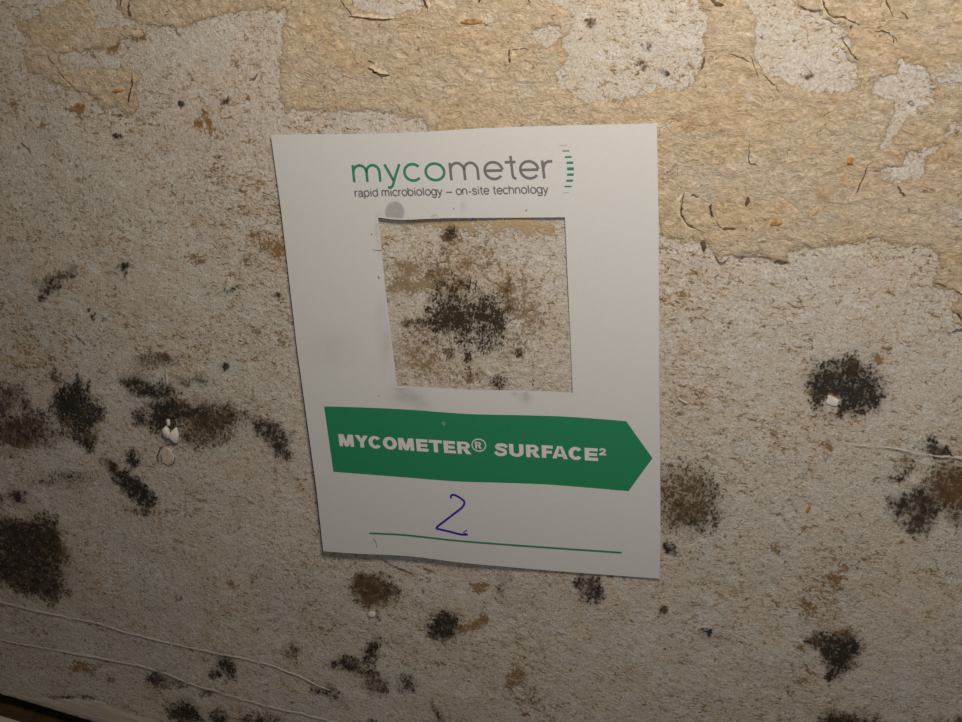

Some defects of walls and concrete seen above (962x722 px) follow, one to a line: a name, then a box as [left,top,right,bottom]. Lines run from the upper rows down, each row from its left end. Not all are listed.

peeling [15,0,962,317]
water stain [386,223,550,390]
water stain [0,470,91,607]
water stain [0,367,161,516]
water stain [118,348,294,462]
water stain [660,456,725,556]
water stain [804,350,886,419]
water stain [885,436,962,538]
water stain [347,571,402,621]
water stain [331,636,418,693]
water stain [426,610,463,643]
water stain [804,629,867,686]